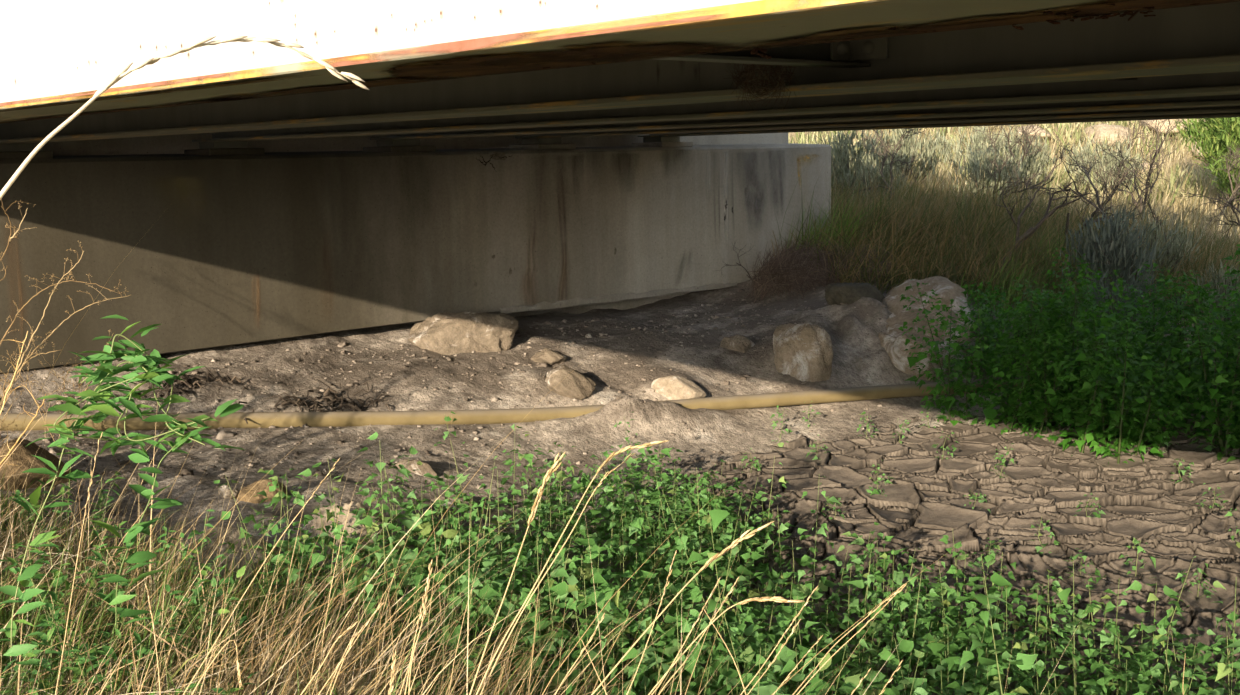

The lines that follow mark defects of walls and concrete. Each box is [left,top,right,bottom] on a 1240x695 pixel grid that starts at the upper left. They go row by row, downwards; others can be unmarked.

corrosion [0,0,1240,124]